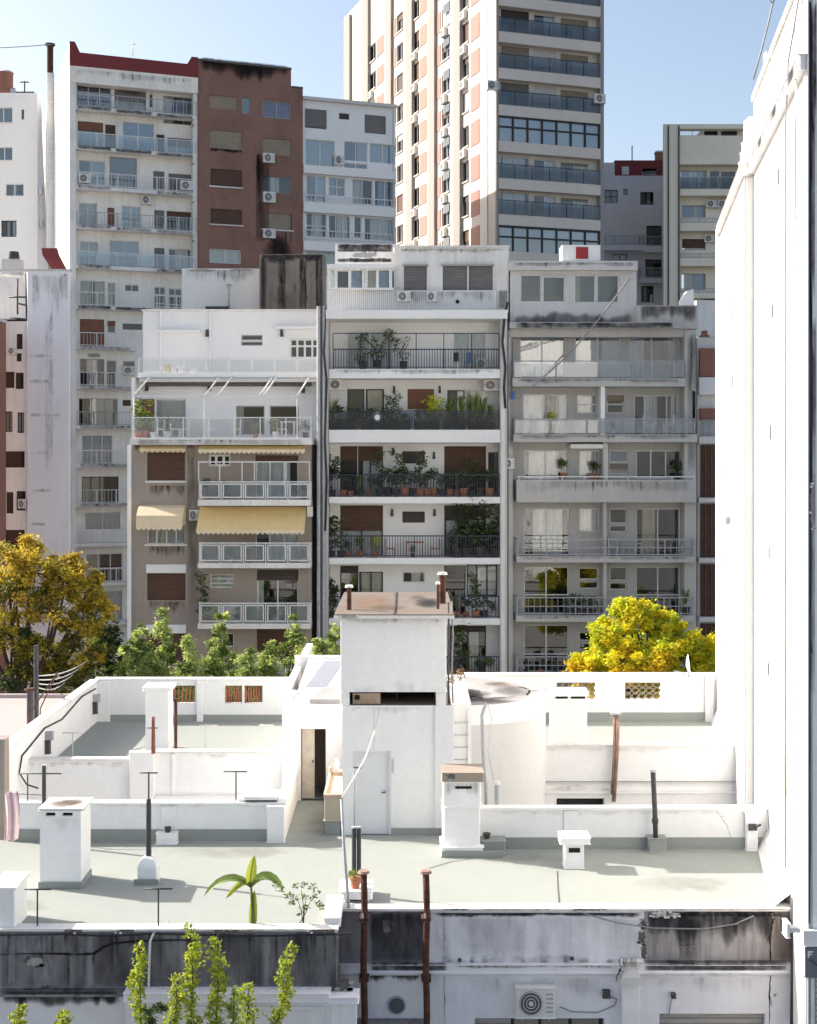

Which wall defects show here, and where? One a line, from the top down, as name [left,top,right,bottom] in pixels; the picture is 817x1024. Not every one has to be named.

water stain [261,232,322,308]
water stain [517,307,695,328]
water stain [370,914,445,980]
water stain [647,911,788,970]